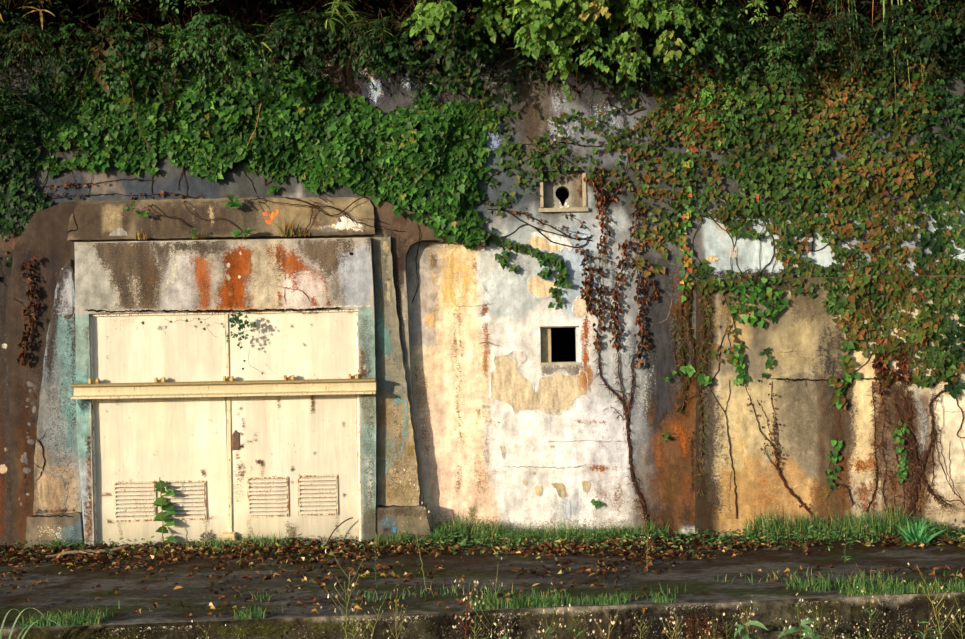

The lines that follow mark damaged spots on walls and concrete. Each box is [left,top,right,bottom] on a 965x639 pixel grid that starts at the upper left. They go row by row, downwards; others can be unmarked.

peeling [55,266,74,329]
corrosion [184,240,333,326]
peeling [527,276,557,300]
peeling [529,231,572,253]
peeling [562,296,591,318]
peeling [18,381,67,510]
water stain [0,199,265,543]
water stain [227,228,498,543]
peeling [477,348,589,417]
corrosion [573,315,696,517]
water stain [501,246,956,534]